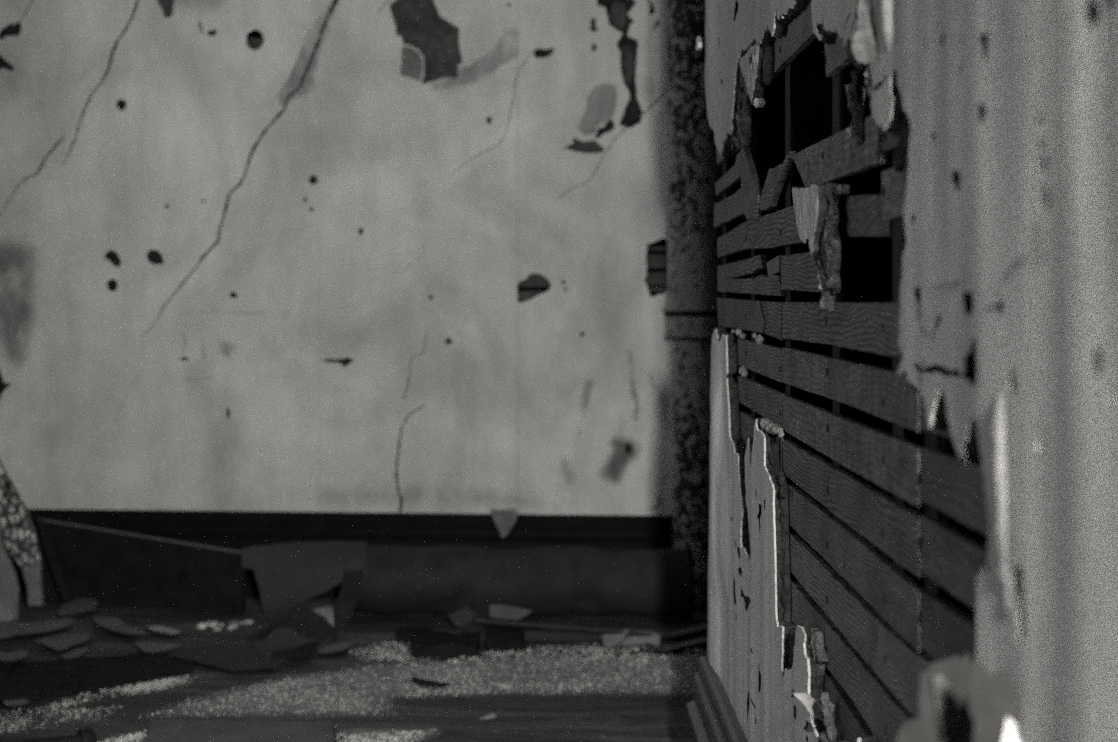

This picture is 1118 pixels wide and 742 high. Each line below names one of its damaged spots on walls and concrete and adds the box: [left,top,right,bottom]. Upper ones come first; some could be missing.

crack [2,0,139,210]
flaking render [390,0,462,84]
flaking render [564,0,659,153]
flaking render [716,0,811,159]
peeling [814,0,878,97]
flaking render [880,69,911,172]
crack [115,0,338,421]
flaking render [517,273,568,303]
flaking render [644,238,667,298]
crack [395,329,427,513]
flaking render [713,327,881,742]
peeling [895,652,1021,742]